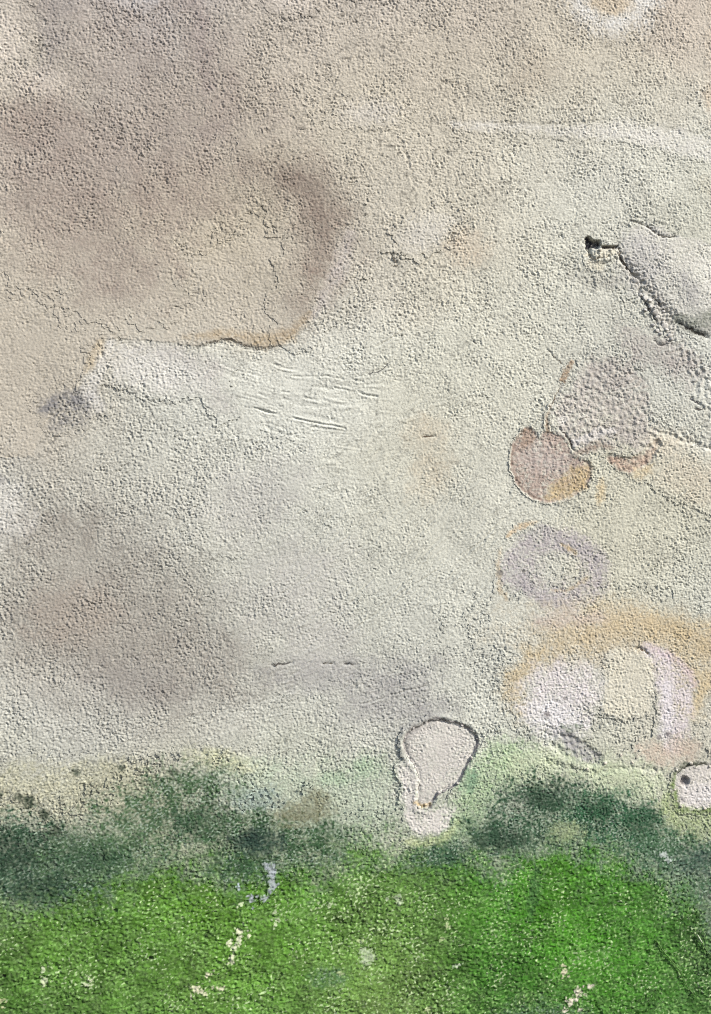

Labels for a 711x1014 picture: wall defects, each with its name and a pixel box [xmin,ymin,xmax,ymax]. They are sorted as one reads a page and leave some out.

spalling [544,345,662,460]
peeling [394,713,480,851]
spalling [668,759,711,817]